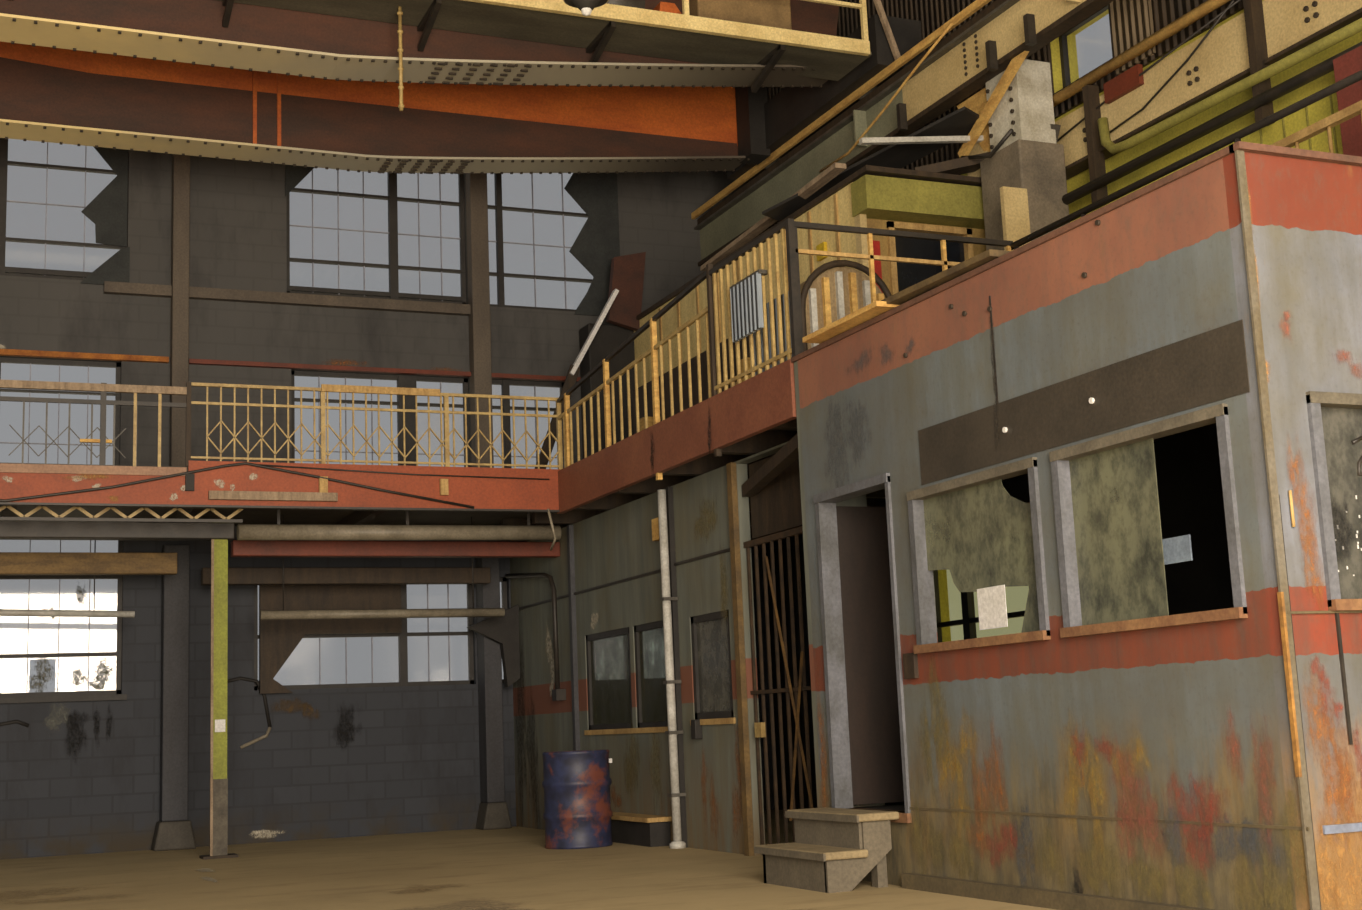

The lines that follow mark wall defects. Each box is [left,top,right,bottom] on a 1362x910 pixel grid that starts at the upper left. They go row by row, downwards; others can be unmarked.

corrosion [1308,691,1356,824]